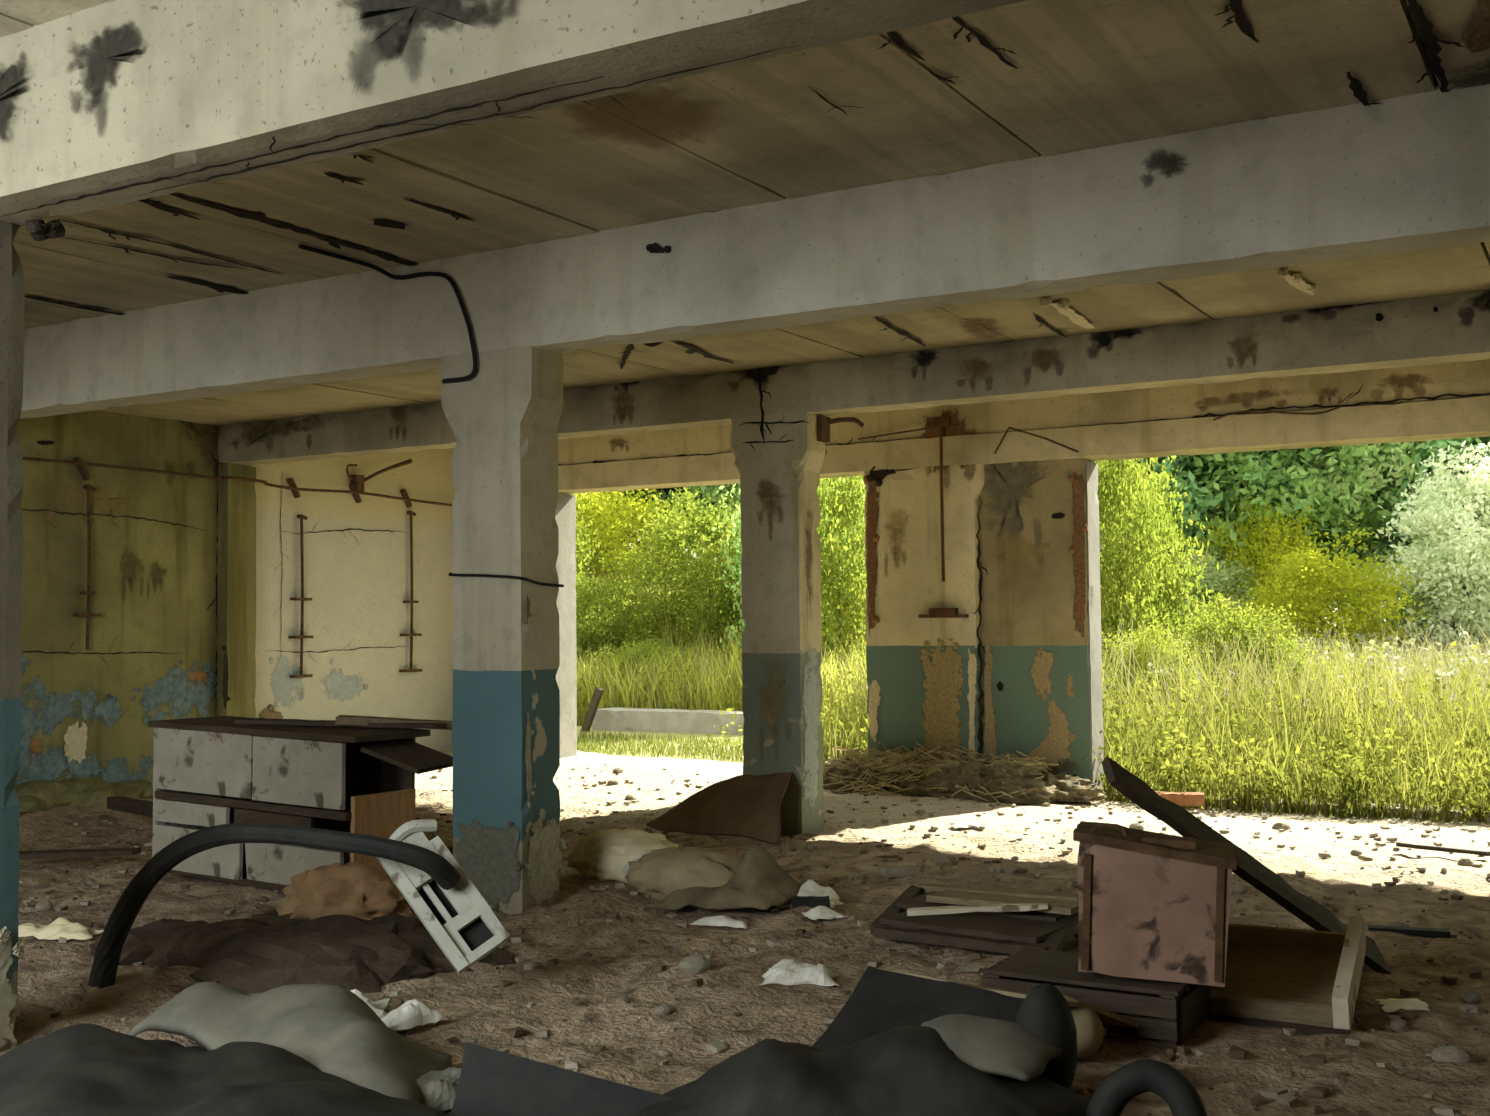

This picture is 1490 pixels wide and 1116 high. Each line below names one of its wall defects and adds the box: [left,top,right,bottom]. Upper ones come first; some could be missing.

water stain [0,54,25,141]
water stain [69,22,140,110]
crack [879,31,956,84]
crack [952,16,1018,69]
crack [1215,0,1259,43]
water stain [732,365,785,383]
crack [1153,385,1490,421]
peeling [15,646,231,785]
peeling [919,637,1003,771]
peeling [1027,647,1076,771]
peeling [454,711,567,910]
peeling [0,926,24,1049]